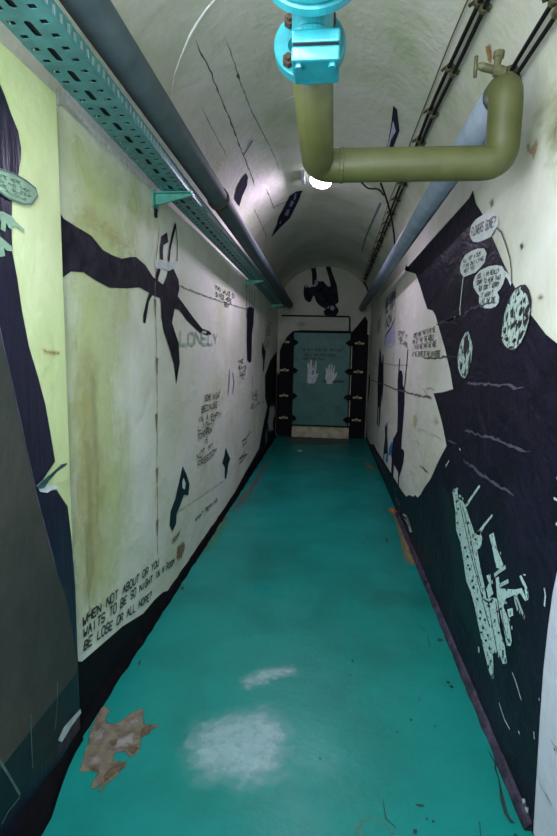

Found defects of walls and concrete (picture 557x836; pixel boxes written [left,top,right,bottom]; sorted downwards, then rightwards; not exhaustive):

crack [196,39,280,237]
spalling [58,709,81,742]
peeling [80,706,158,791]